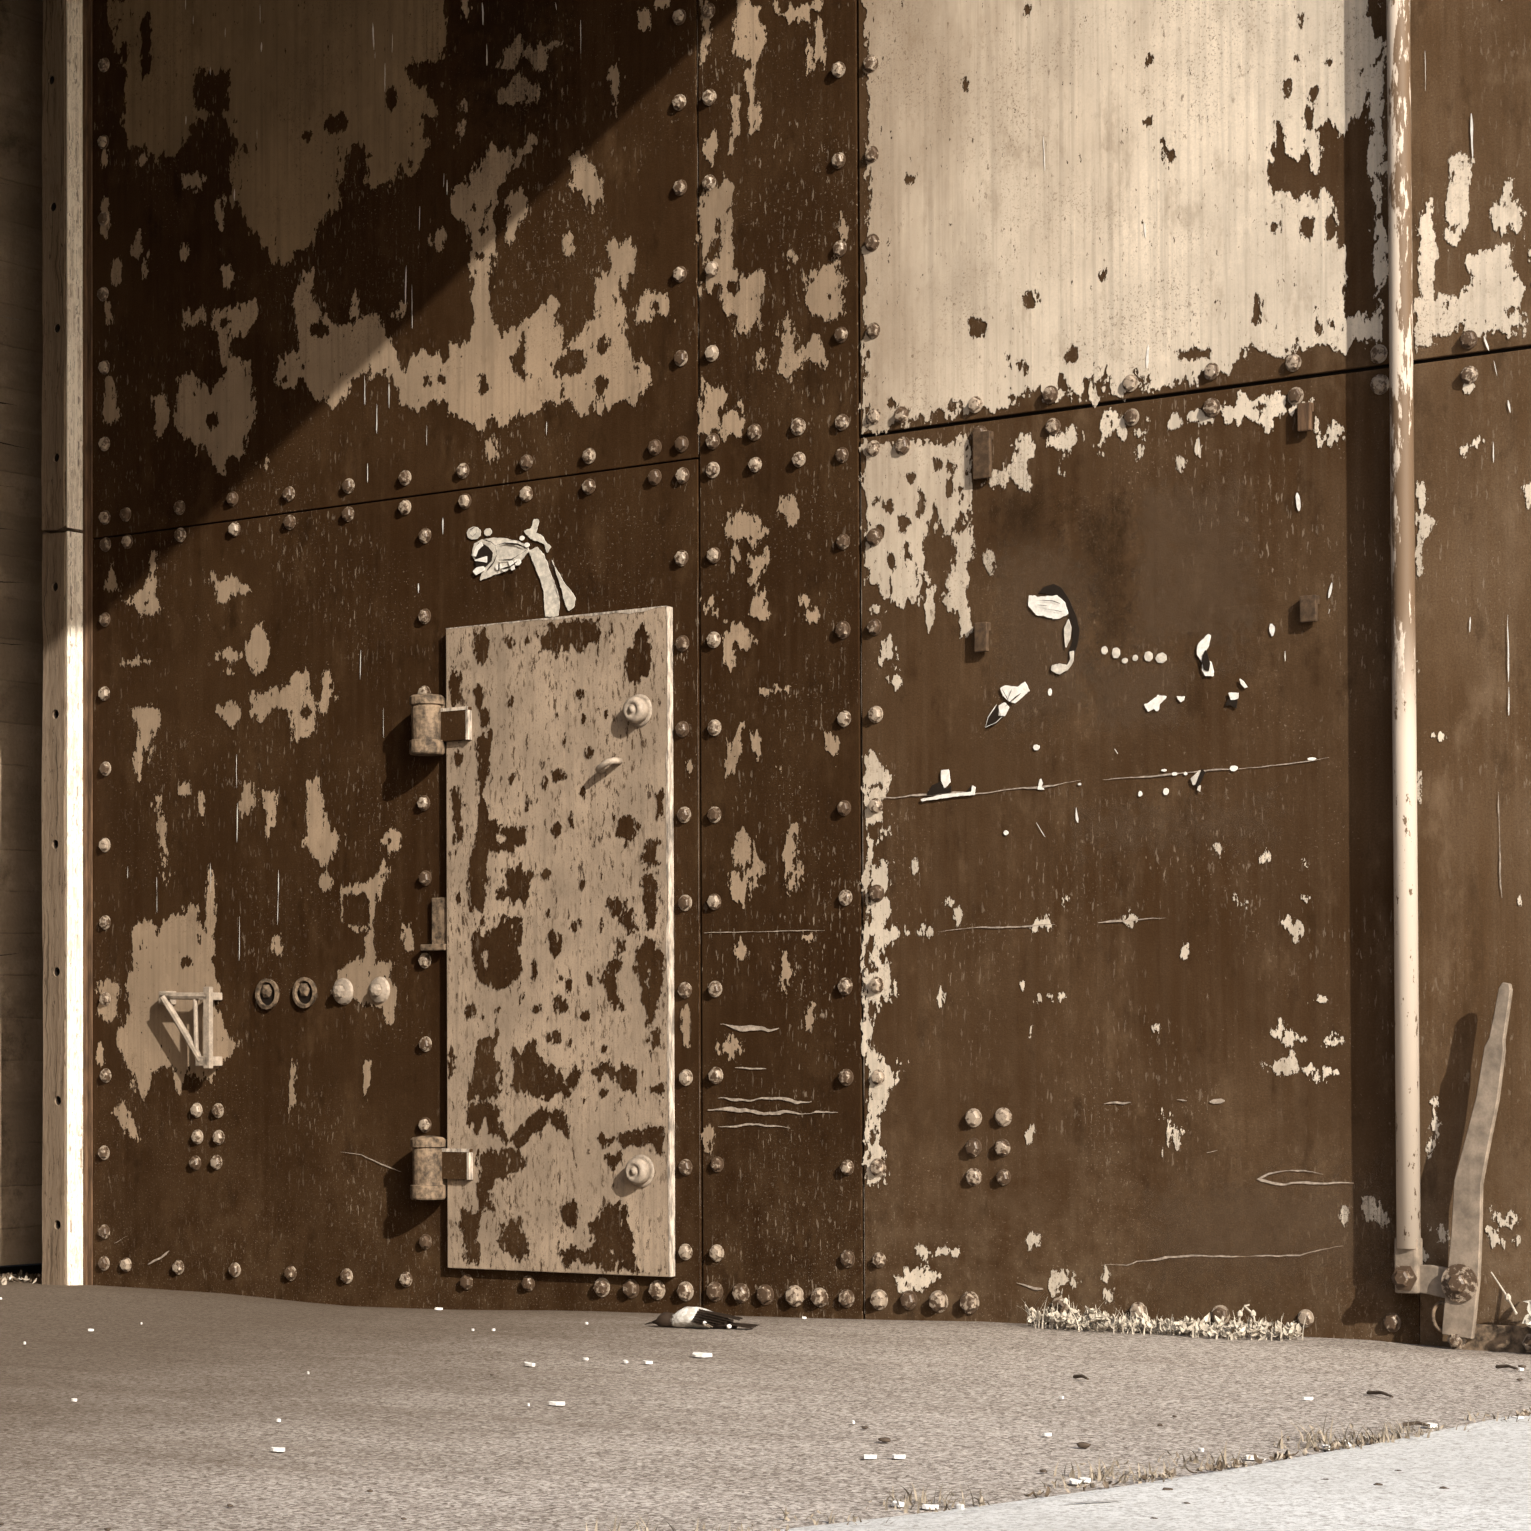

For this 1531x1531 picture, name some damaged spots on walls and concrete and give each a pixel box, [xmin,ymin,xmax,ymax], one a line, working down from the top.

peeling [102,0,676,477]
peeling [694,0,1389,638]
peeling [1413,152,1531,353]
peeling [130,703,161,783]
peeling [95,864,240,1143]
peeling [238,778,278,839]
peeling [215,621,337,743]
peeling [302,776,414,1025]
peeling [727,826,765,909]
peeling [698,491,799,673]
peeling [782,822,804,895]
peeling [858,749,934,1189]